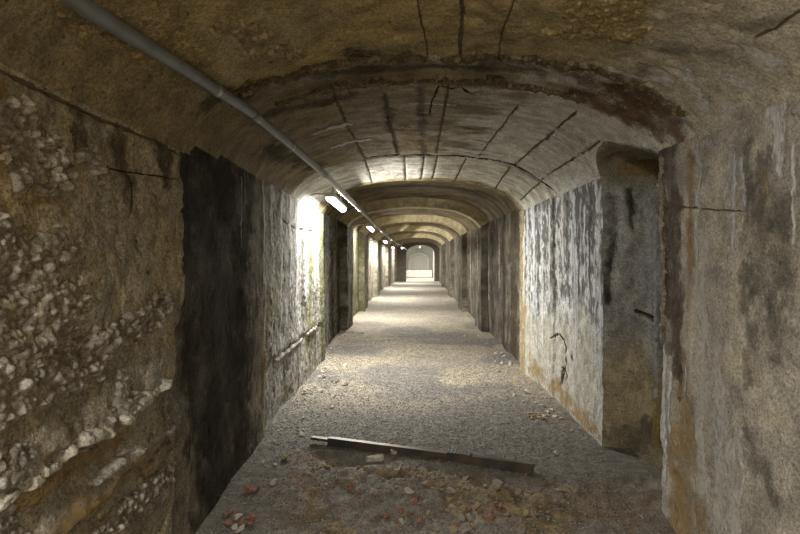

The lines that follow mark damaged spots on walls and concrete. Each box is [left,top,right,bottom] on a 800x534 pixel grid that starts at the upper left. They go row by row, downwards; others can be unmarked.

crack [457,0,465,56]
crack [753,10,800,39]
water stain [606,65,742,121]
crack [331,84,600,201]
crack [106,166,178,213]
water stain [626,189,634,227]
crack [665,204,743,212]
water stain [488,120,615,418]
water stain [158,144,323,512]
rust [572,75,711,534]
rust [519,297,597,433]
crack [550,333,568,385]